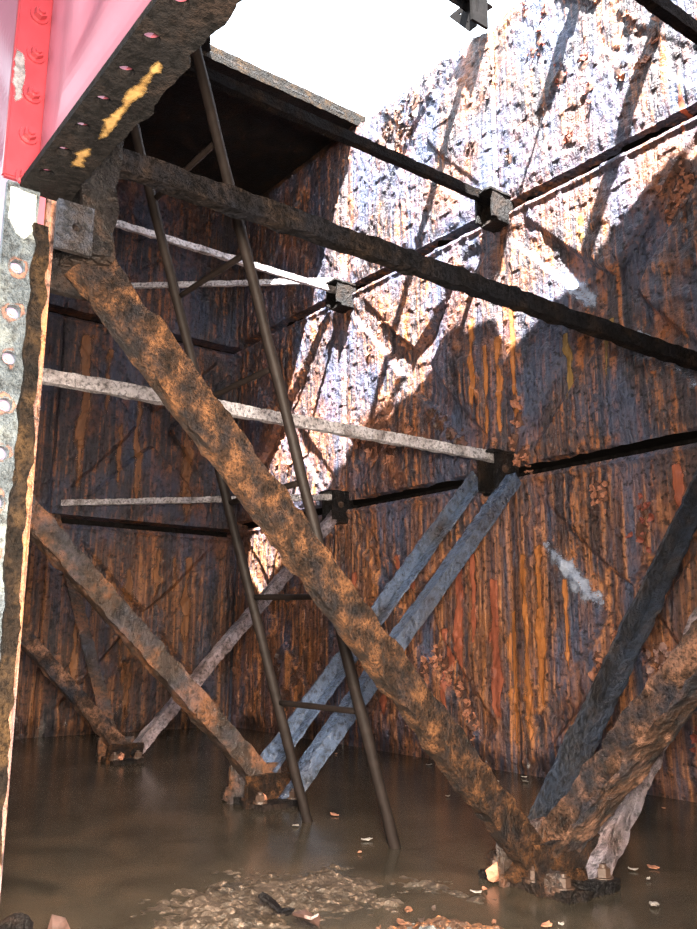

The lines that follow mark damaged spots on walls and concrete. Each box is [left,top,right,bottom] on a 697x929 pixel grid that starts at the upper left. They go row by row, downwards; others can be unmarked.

peeling [13,50,26,101]
peeling [8,186,36,239]
rust [655,157,697,227]
rust [74,391,92,486]
rust [116,401,143,499]
rust [349,438,415,464]
rust [373,418,414,436]
rust [672,463,685,507]
leakage [543,543,604,605]
rust [489,544,546,745]
rust [562,579,570,669]
rust [646,642,671,674]